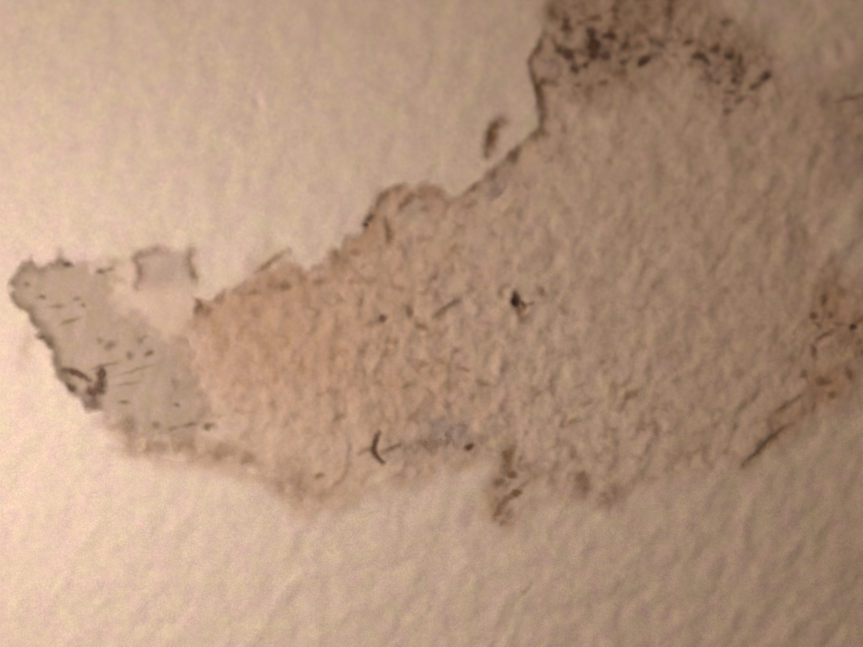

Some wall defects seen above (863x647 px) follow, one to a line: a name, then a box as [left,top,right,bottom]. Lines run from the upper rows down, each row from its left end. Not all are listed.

damp [556,18,624,73]
spalling [487,122,500,148]
flaking render [12,259,208,437]